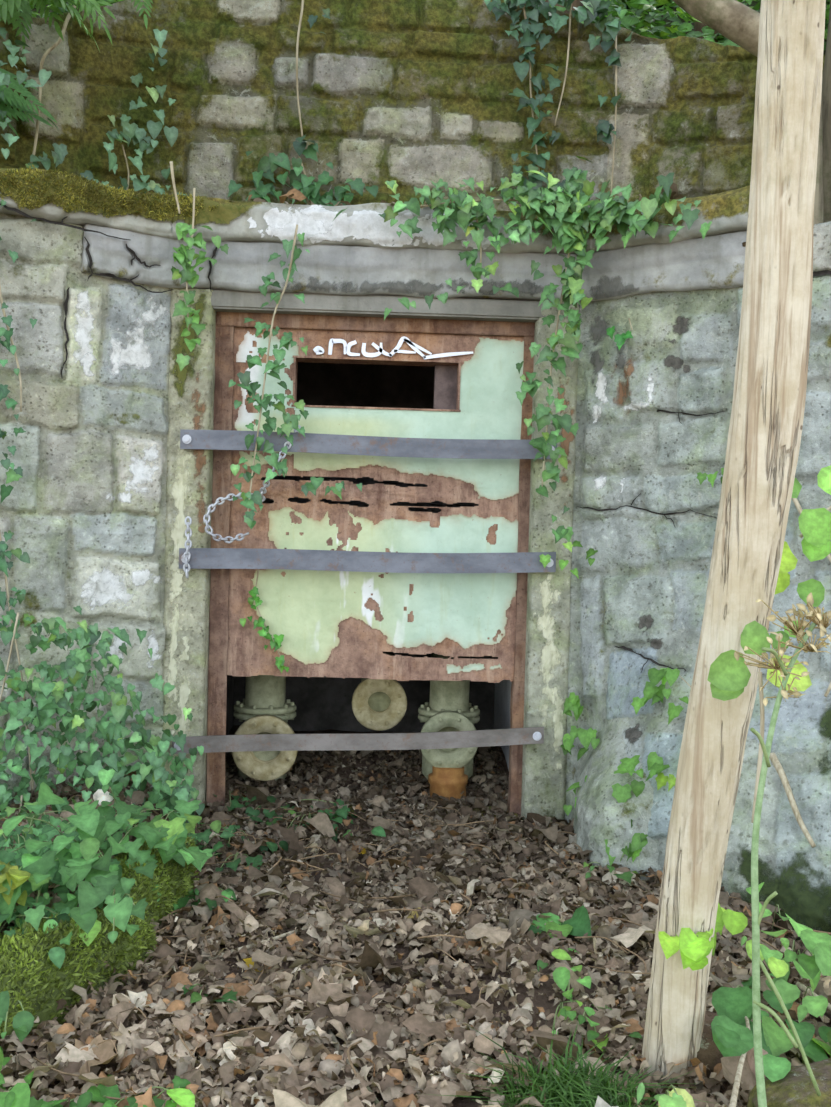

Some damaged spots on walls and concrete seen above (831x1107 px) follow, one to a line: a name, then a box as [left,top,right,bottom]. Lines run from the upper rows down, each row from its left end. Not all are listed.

crack [0,203,174,376]
crack [813,269,831,277]
crack [577,493,716,528]
water stain [819,705,831,739]